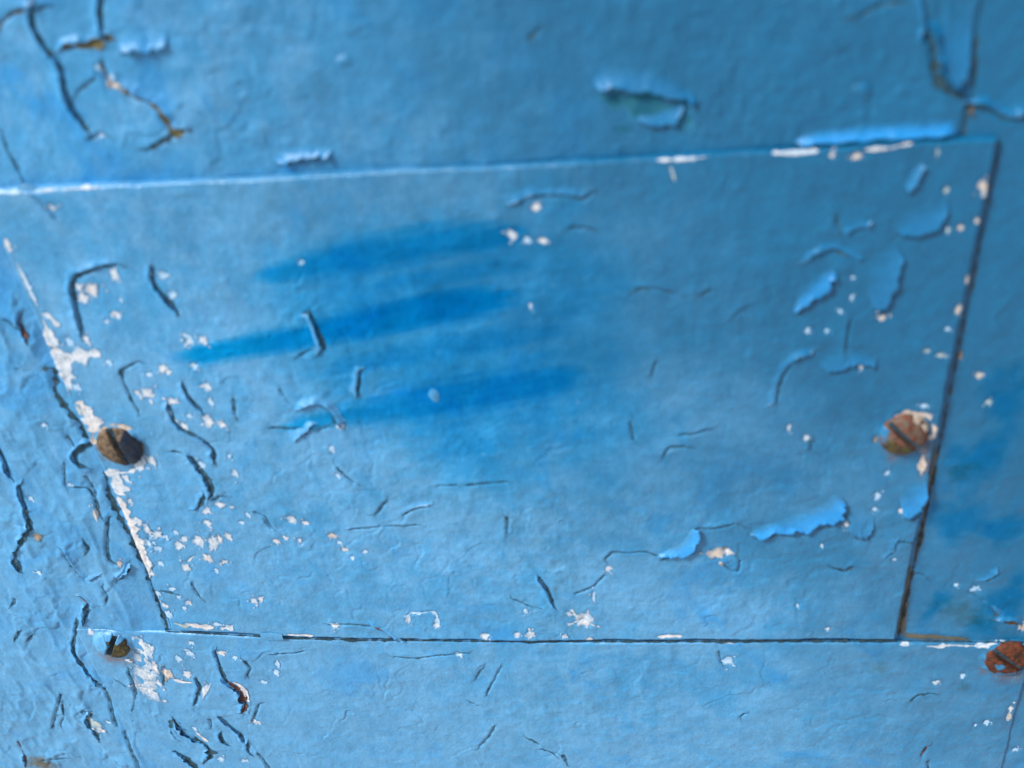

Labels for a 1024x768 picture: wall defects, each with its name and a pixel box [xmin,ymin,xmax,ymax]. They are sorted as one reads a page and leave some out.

crack [0,0,192,152]
peeling [592,67,700,138]
peeling [772,119,959,160]
crack [839,0,1024,137]
crack [0,311,29,347]
spalling [4,238,134,445]
crack [0,449,33,574]
crack [8,599,35,644]
spalling [104,454,251,703]
crack [37,141,1024,768]
peeling [750,491,884,541]
peeling [898,455,929,521]